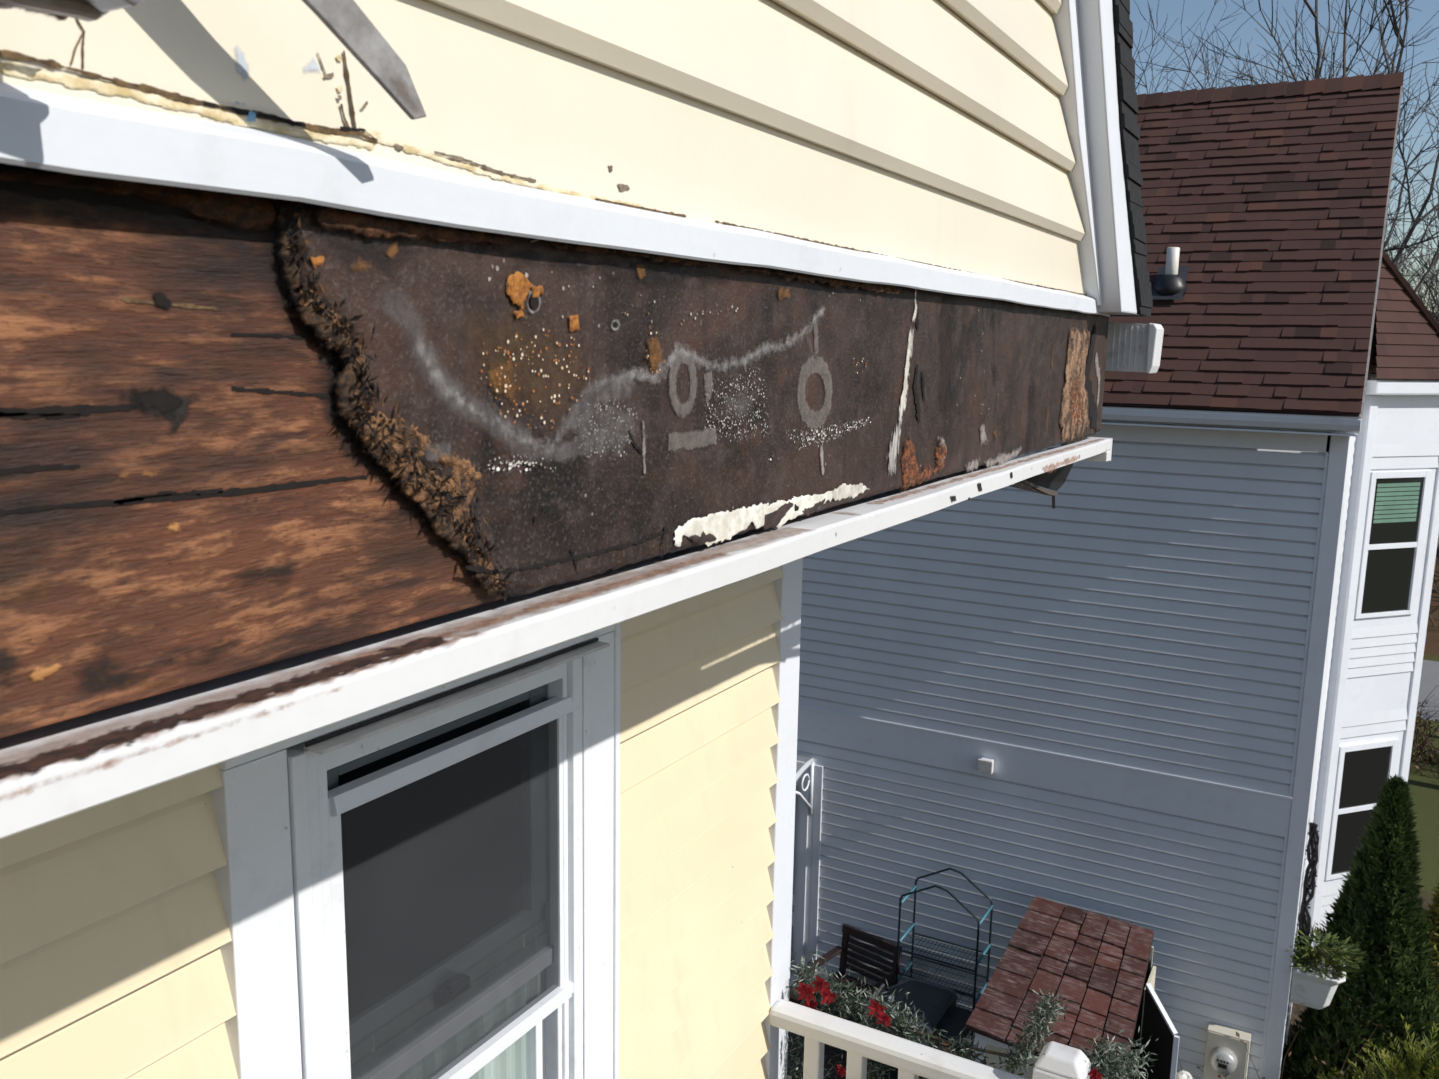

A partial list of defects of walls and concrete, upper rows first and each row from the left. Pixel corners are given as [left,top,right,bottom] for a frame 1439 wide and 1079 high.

corrosion [481,271,591,429]
crack [0,404,141,420]
peeling [275,199,517,602]
crack [0,464,367,516]
peeling [673,483,869,547]
corrosion [868,439,1101,504]
peeling [30,664,62,681]